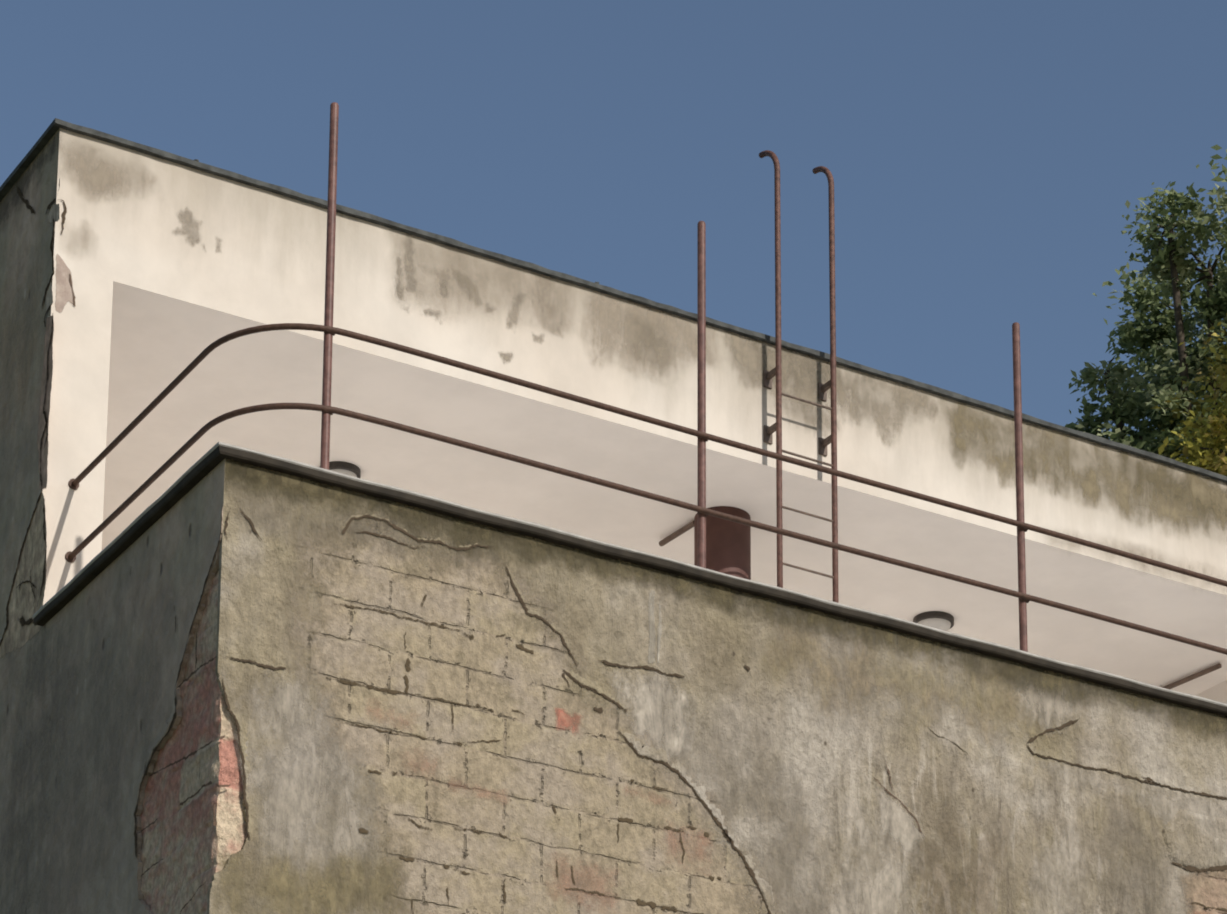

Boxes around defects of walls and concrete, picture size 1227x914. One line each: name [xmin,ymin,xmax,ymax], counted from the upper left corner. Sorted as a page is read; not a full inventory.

damp [68,153,127,194]
damp [397,239,415,299]
crack [16,178,67,490]
damp [591,295,710,364]
damp [731,332,936,439]
damp [950,403,1227,529]
spalling [131,568,258,914]
peeling [293,520,776,914]
crack [1026,719,1227,799]
peeling [1184,869,1227,914]